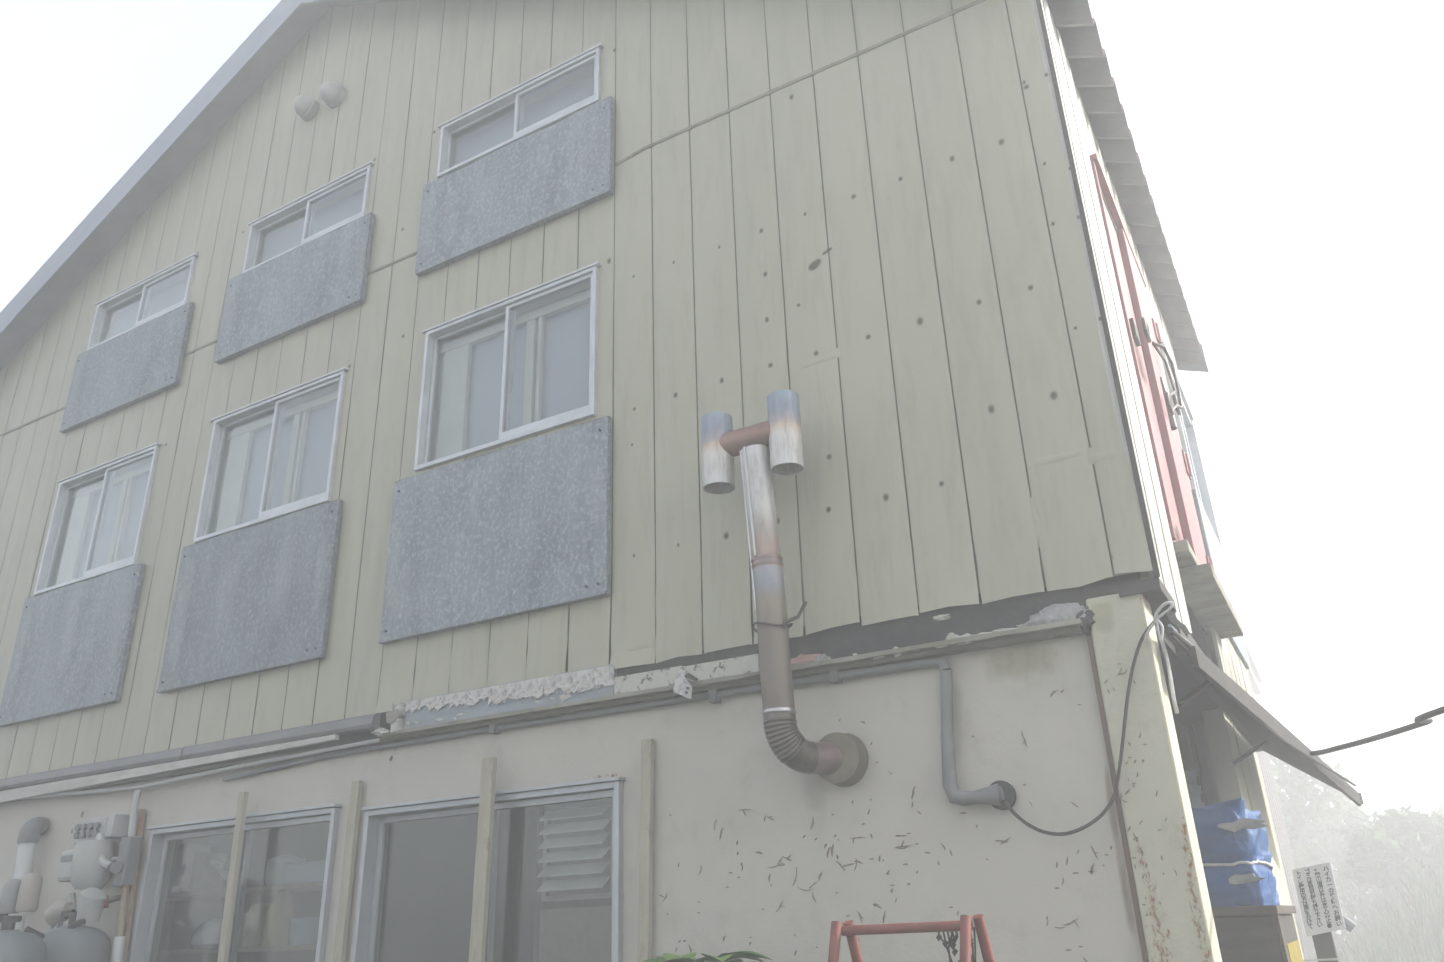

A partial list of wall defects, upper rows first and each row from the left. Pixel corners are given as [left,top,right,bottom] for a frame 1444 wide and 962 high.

peeling [789,586,1086,659]
peeling [390,642,759,732]
corrosion [1182,825,1210,962]